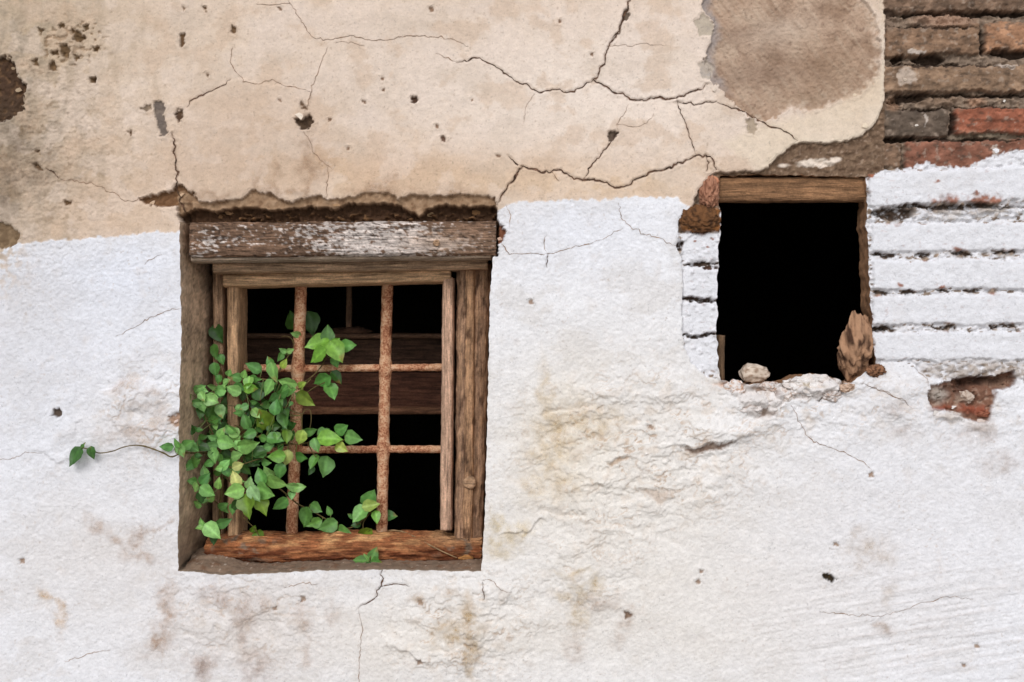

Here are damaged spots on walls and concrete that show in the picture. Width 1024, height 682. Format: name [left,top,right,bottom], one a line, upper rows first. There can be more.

flaking render [0,21,101,123]
crack [172,136,190,220]
flaking render [137,182,502,259]
crack [187,0,798,267]
spalling [698,175,720,208]
flaking render [700,0,1024,179]
spalling [926,369,1019,426]
crack [358,571,405,679]